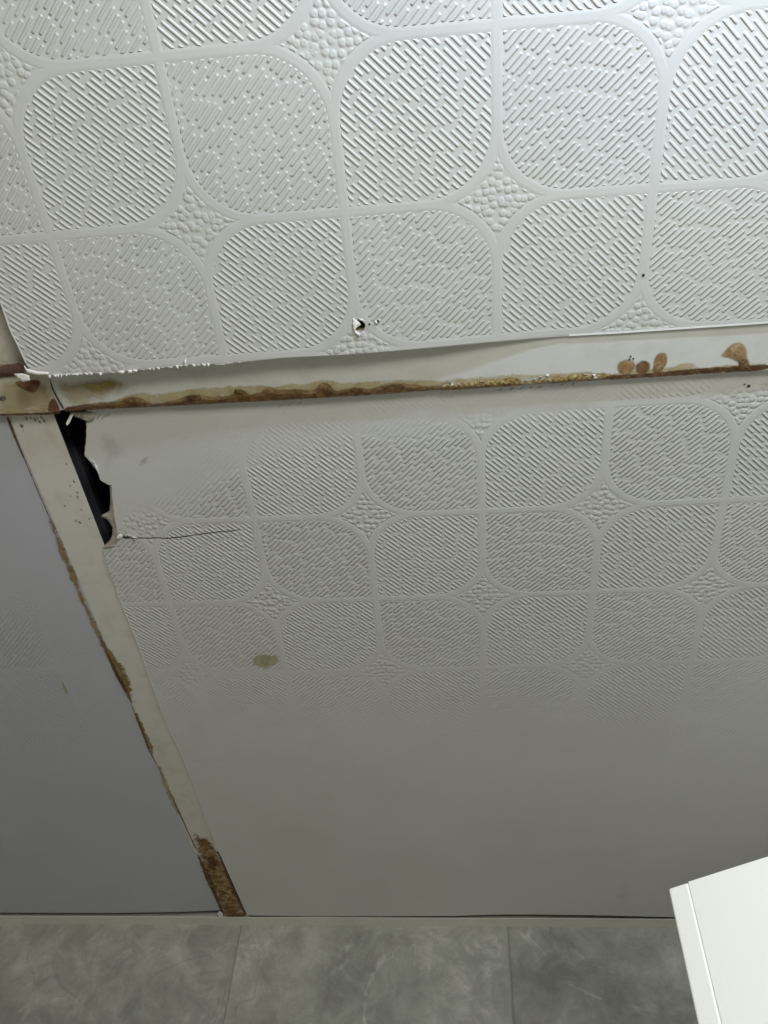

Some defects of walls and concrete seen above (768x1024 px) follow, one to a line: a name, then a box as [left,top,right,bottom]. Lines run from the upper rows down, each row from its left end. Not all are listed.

spalling [66,412,103,426]
spalling [101,485,123,549]
crack [122,529,241,543]
corrosion [0,343,768,917]
water stain [255,656,277,667]